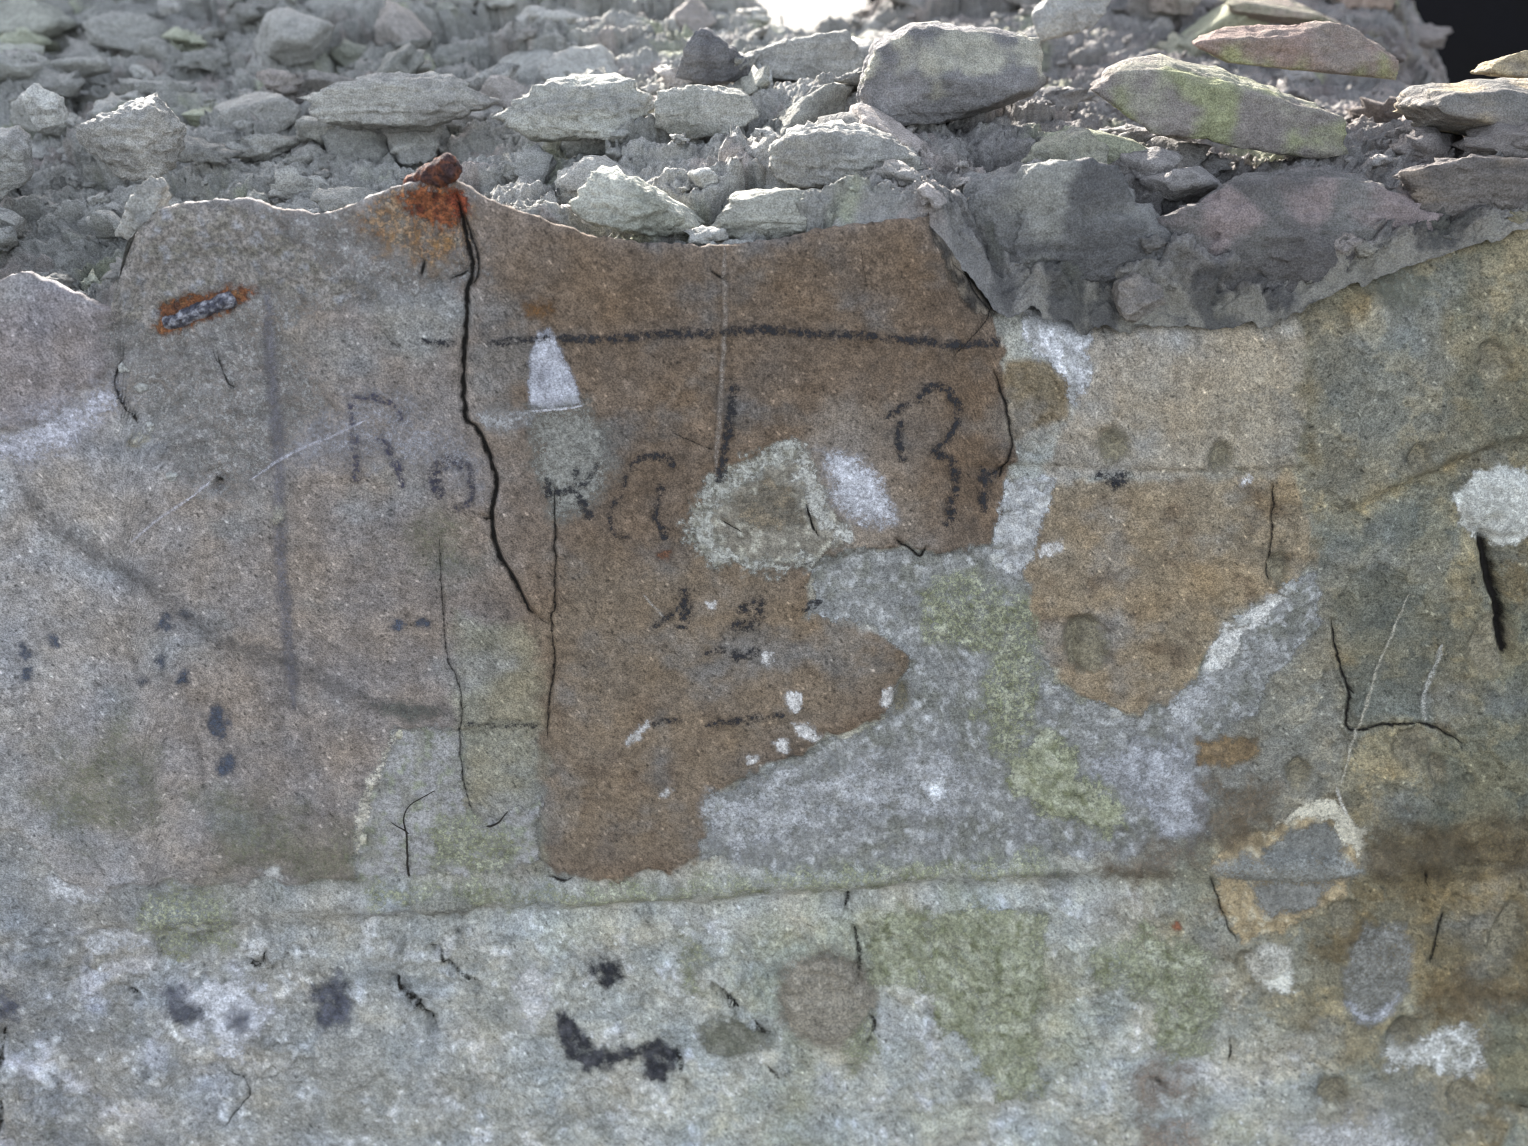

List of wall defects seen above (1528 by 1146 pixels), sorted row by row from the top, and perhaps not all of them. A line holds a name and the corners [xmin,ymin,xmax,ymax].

rust [153,283,258,335]
rust [349,184,476,265]
crack [421,196,557,737]
spalling [678,438,1324,875]